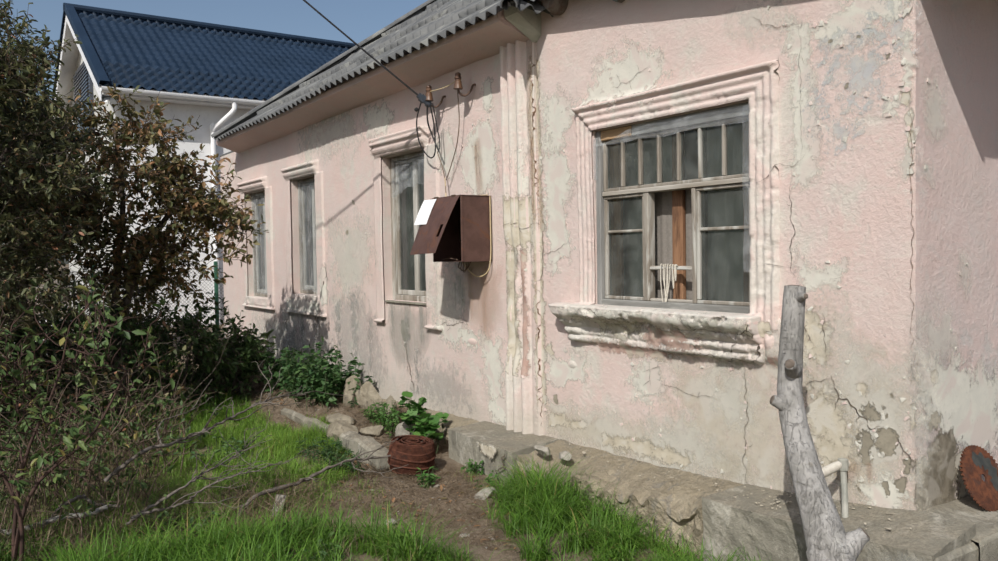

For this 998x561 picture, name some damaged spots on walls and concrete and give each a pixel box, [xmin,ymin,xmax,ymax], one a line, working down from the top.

peeling [433,39,792,491]
crack [756,141,804,284]
flaking render [782,0,998,509]
crack [644,320,778,479]
leakage [913,428,970,510]